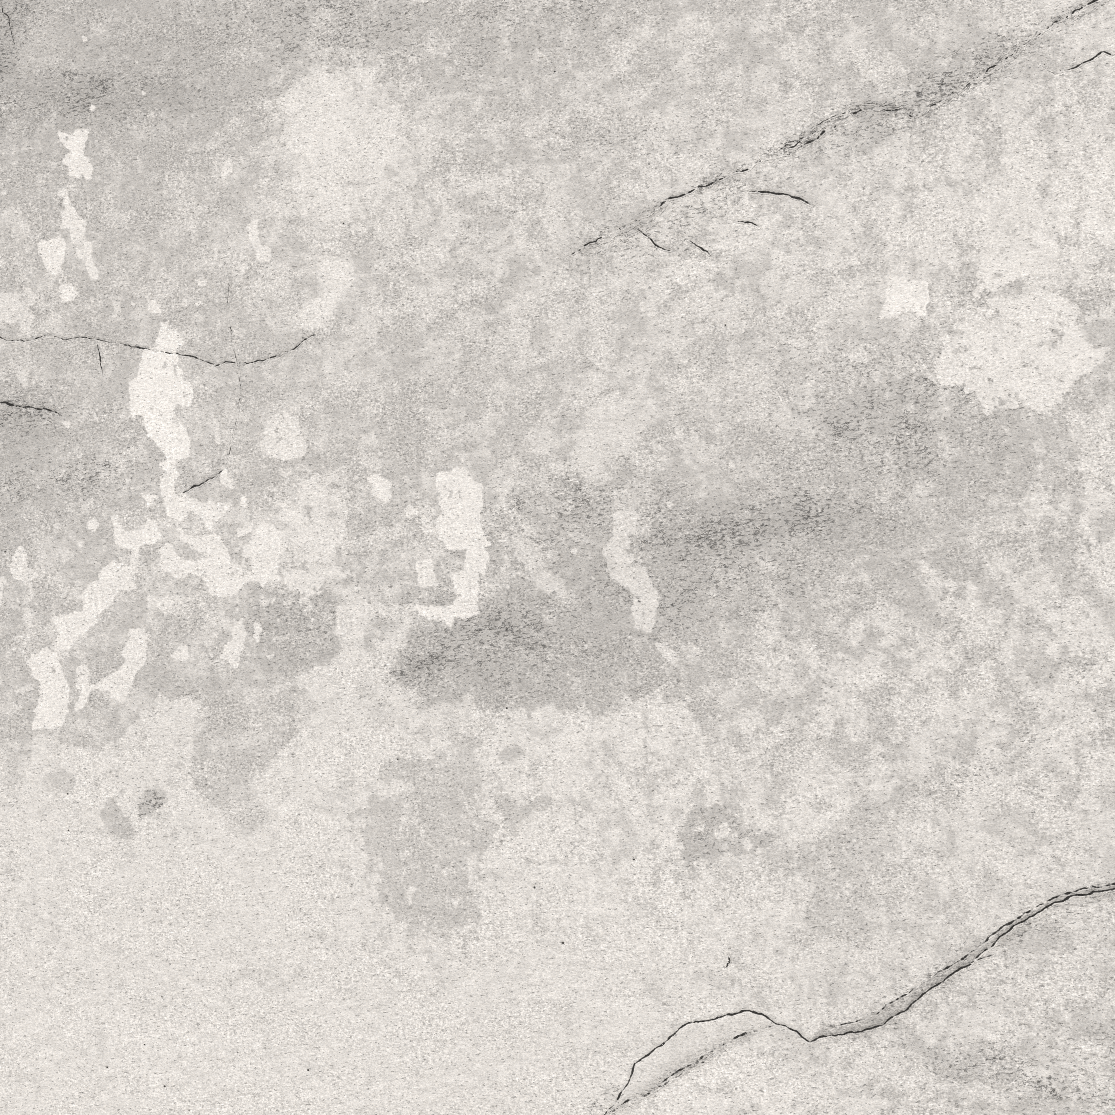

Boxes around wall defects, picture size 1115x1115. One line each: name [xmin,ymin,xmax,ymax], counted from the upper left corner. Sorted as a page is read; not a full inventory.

crack [565,0,1115,258]
crack [0,268,320,496]
crack [602,881,1115,1115]